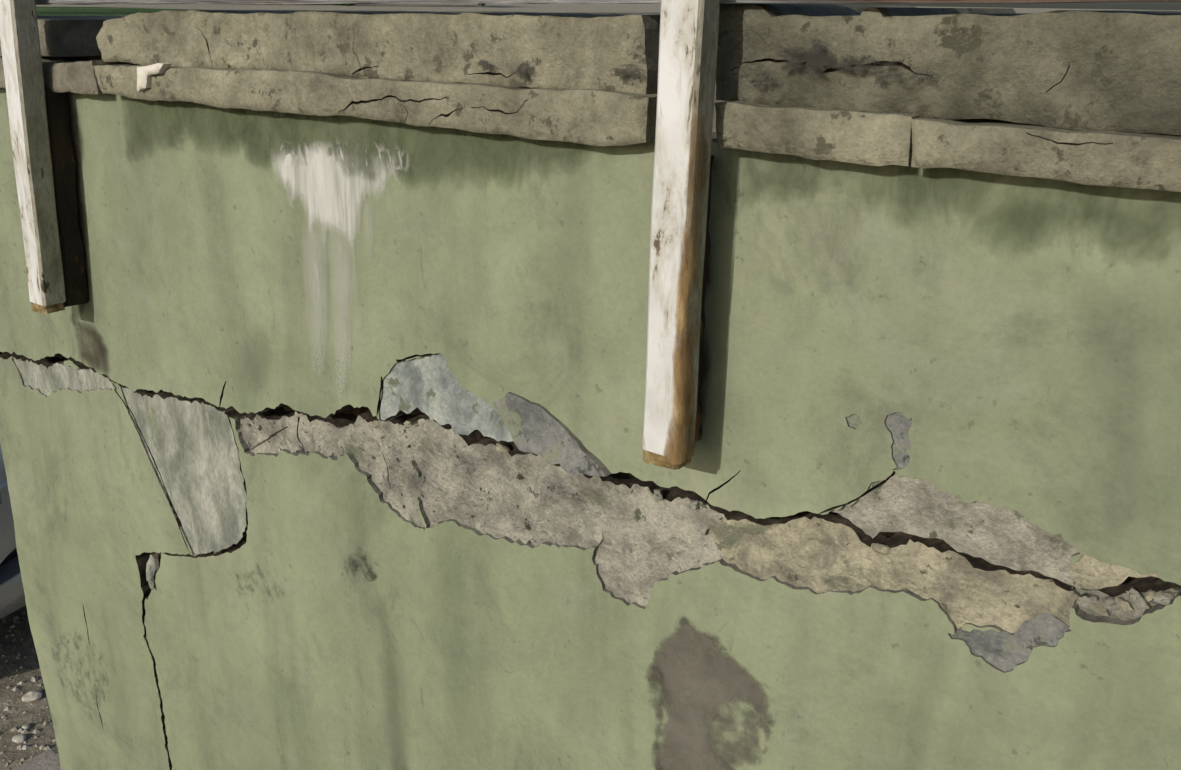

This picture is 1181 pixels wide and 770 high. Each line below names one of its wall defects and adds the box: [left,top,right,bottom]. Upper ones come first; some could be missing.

crack [356,96,451,116]
leakage [276,146,400,239]
crack [250,405,295,451]
crack [340,407,388,469]
crack [410,409,424,417]
crack [862,472,896,495]
flaking render [14,353,1181,672]
crack [213,540,247,552]
crack [871,531,904,555]
crack [146,552,161,590]
crack [1076,576,1174,616]
leakage [648,618,771,770]